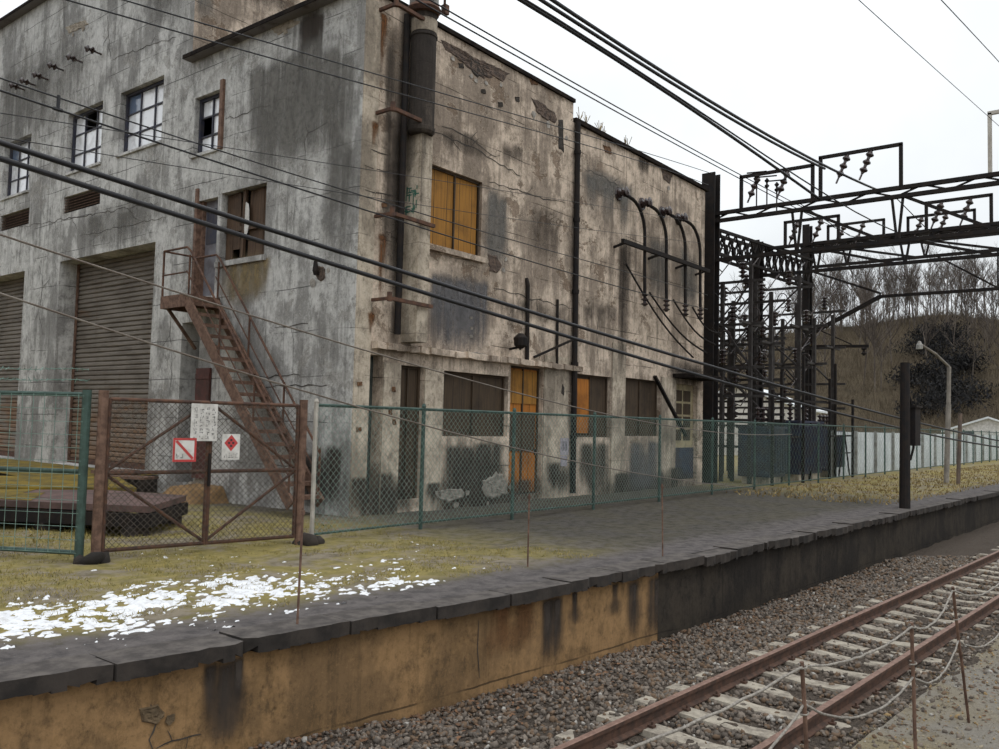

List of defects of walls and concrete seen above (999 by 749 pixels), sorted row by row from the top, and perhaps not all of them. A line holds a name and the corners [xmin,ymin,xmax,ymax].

spalling [441,40,510,94]
spalling [515,97,568,153]
damp [432,275,487,345]
damp [543,592,577,646]
damp [629,582,638,621]
damp [205,659,243,731]
crack [149,704,201,749]